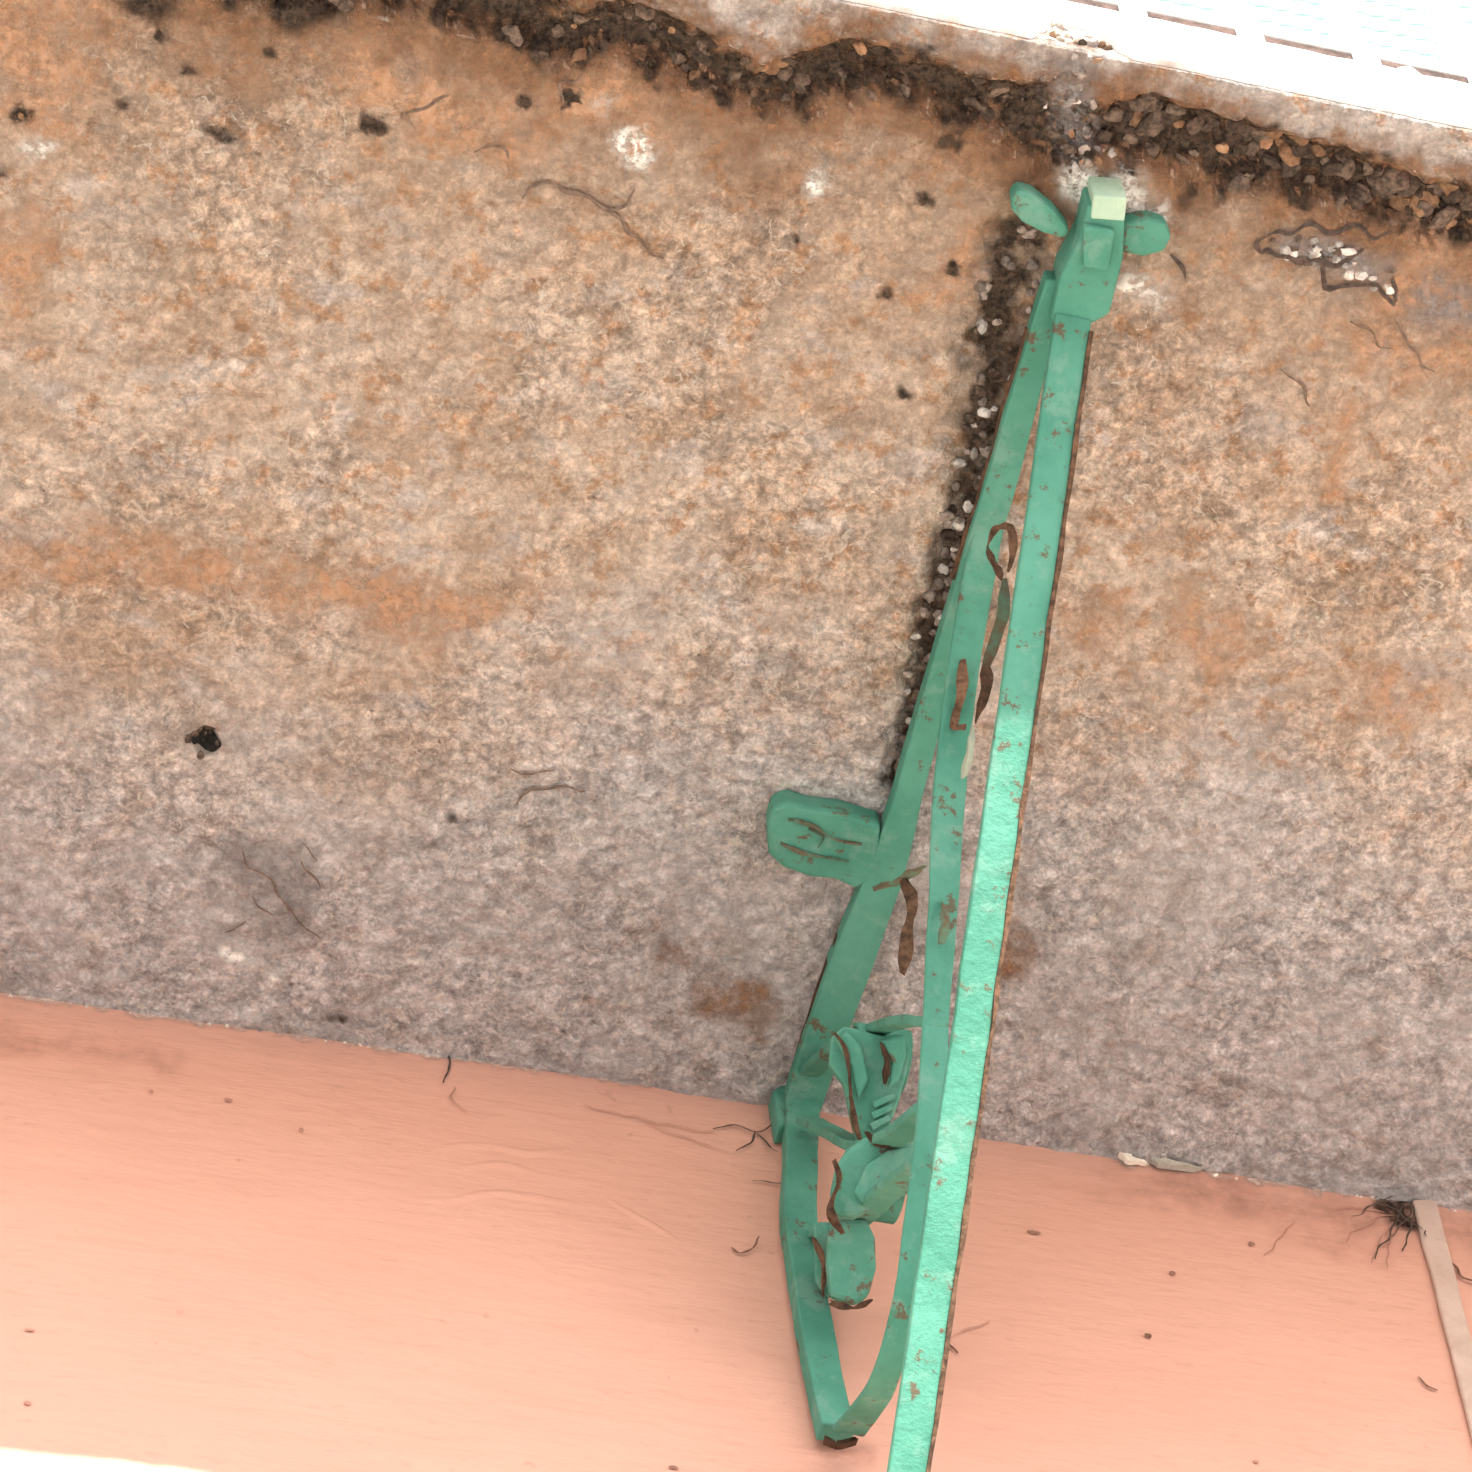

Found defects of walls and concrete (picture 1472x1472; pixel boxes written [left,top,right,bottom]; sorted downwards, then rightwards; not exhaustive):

spalling [9,104,33,123]
spalling [154,0,1472,312]
spalling [882,218,1043,783]